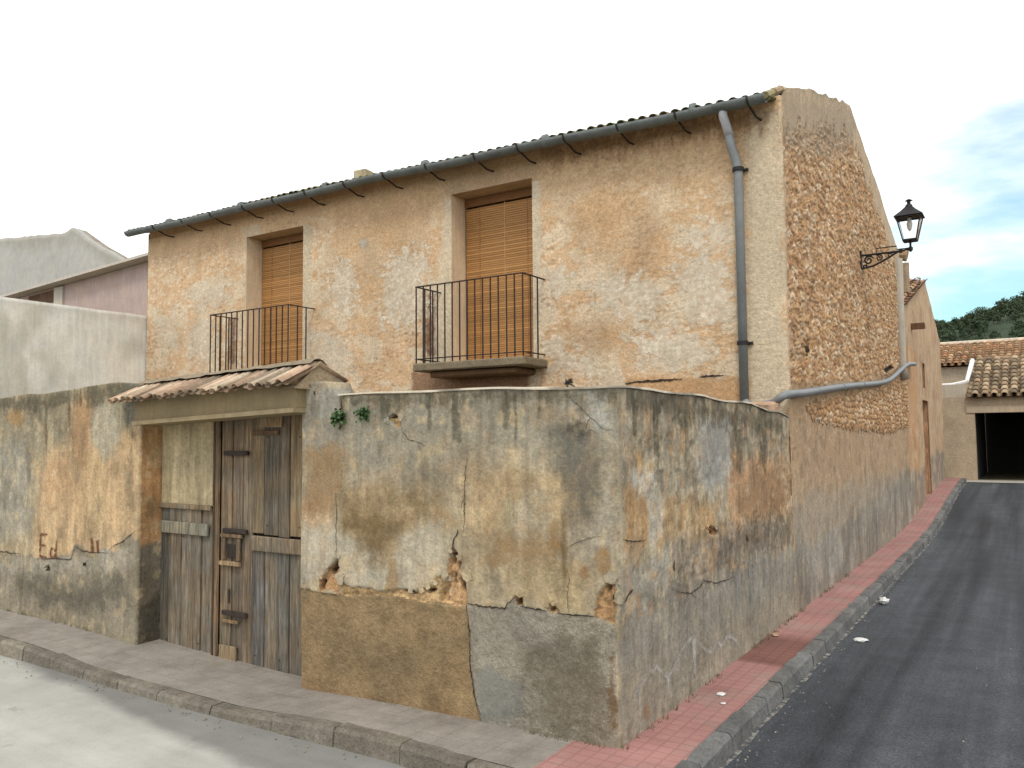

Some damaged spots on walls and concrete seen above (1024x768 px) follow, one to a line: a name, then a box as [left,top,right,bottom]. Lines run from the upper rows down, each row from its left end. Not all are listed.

water stain [341,393,461,442]
water stain [593,388,783,471]
crack [452,458,468,550]
crack [44,534,131,560]
peeling [318,548,473,606]
spalling [594,572,624,625]
crack [674,560,730,597]
water stain [634,635,737,707]